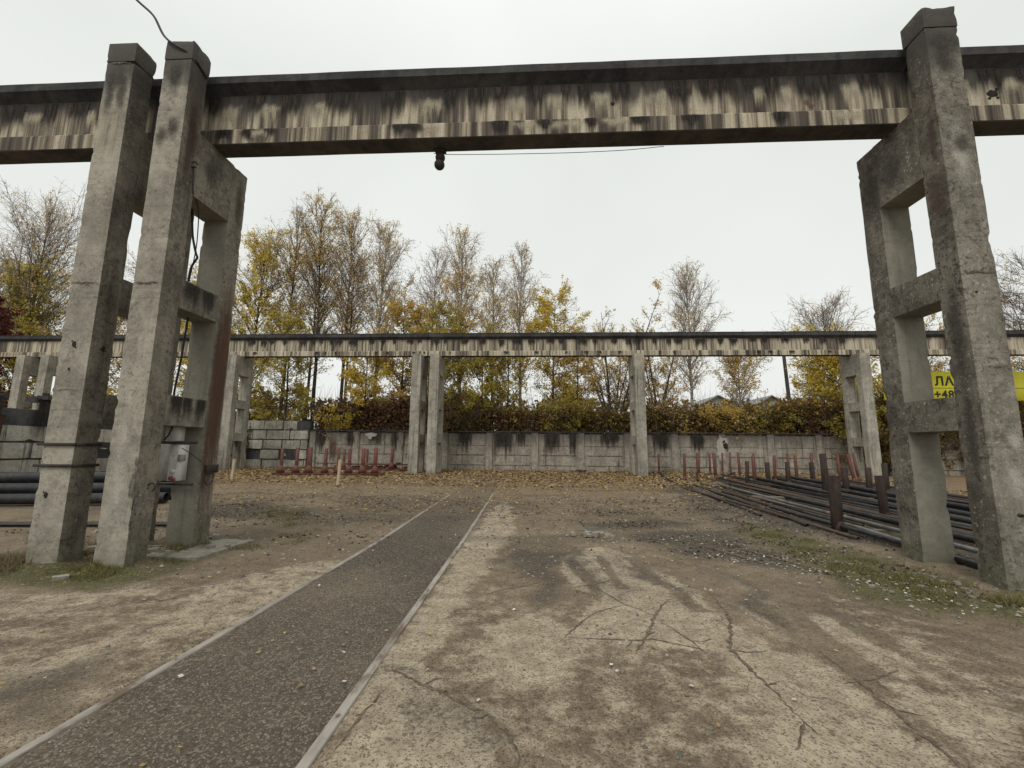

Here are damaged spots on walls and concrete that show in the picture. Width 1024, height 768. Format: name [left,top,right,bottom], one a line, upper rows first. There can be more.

leakage [316,93,359,116]
leakage [392,82,649,133]
leakage [661,73,884,122]
corrosion [201,322,229,486]
leakage [347,432,405,448]
leakage [494,433,525,455]
leakage [544,434,576,454]
leakage [691,435,703,450]
crack [560,573,818,750]